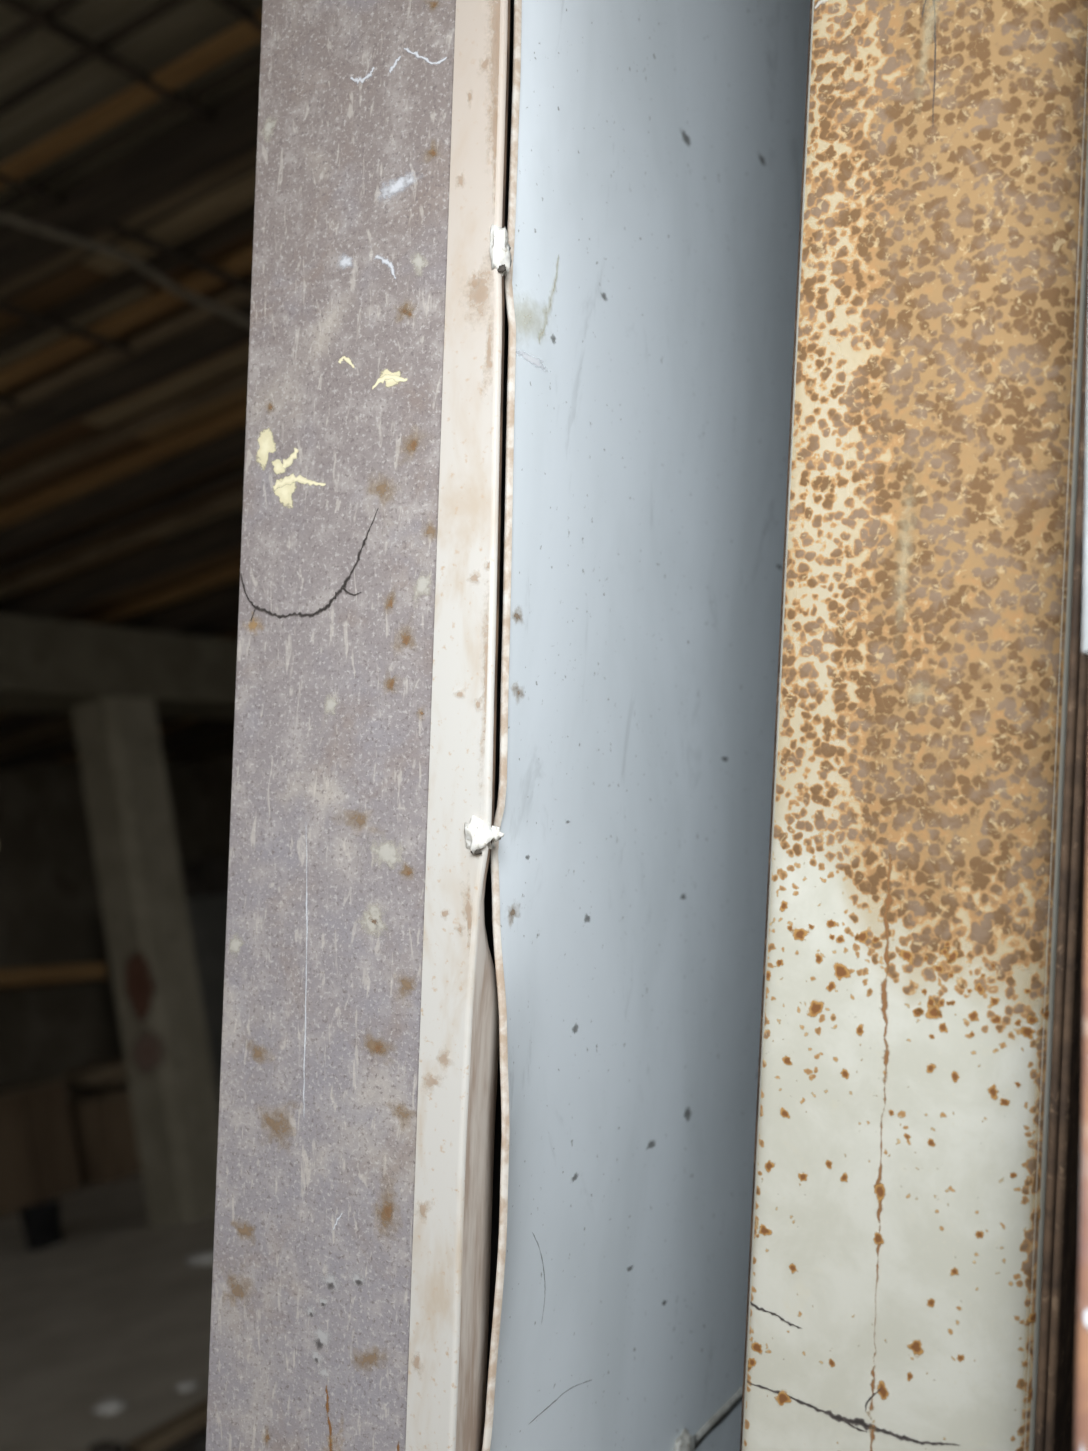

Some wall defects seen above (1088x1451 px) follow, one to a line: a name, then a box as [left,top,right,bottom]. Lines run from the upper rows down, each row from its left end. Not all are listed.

crack [922,0,936,113]
crack [240,509,378,622]
rust [744,0,1088,1451]
crack [750,1301,802,1329]
crack [747,1381,960,1446]